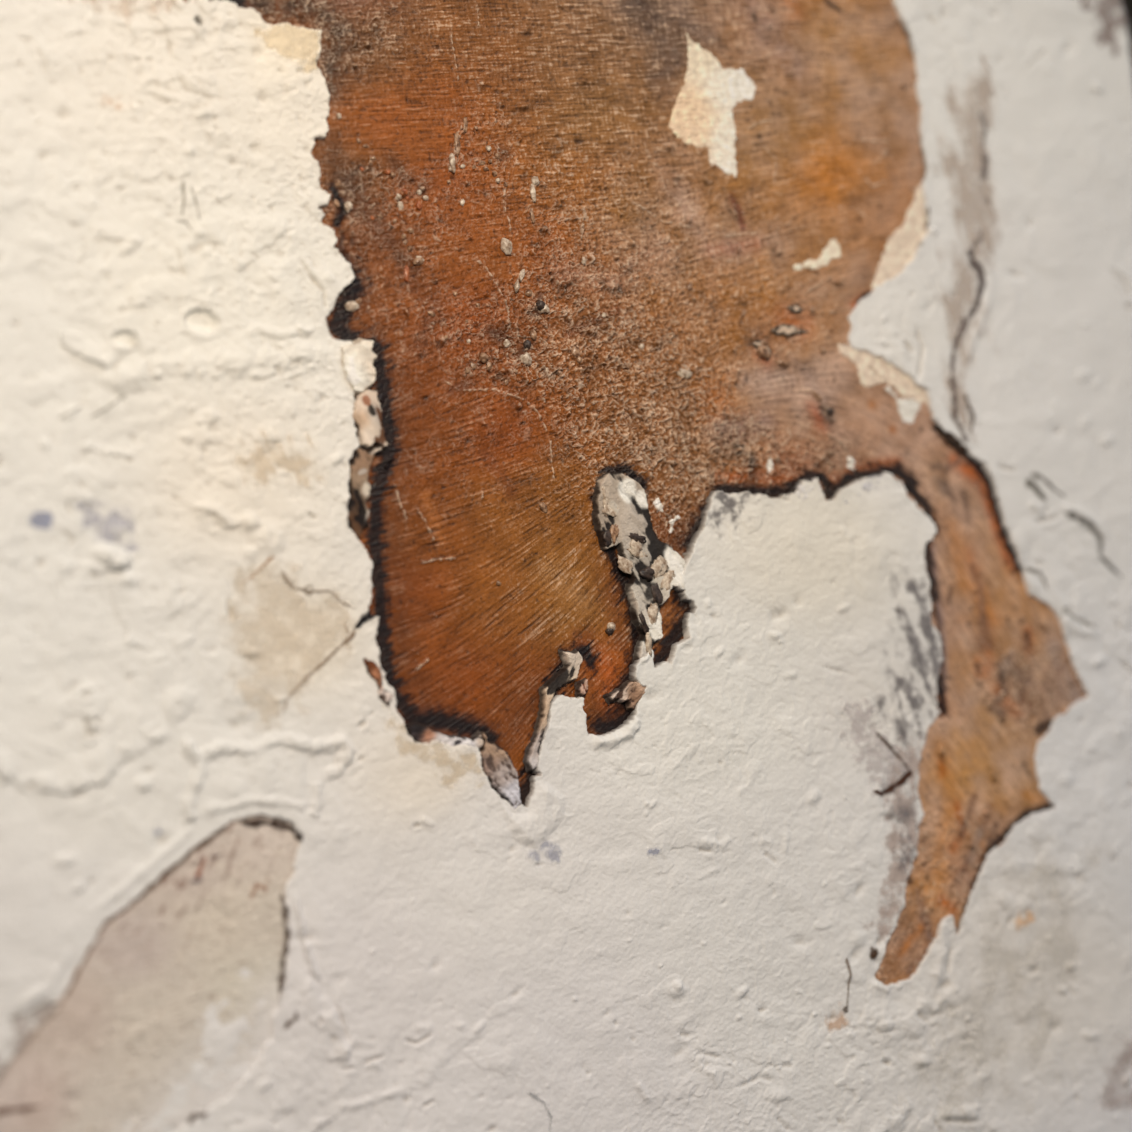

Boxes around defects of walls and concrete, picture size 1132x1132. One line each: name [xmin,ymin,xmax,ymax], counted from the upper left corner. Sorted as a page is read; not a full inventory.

crack [979,112,990,204]
spalling [209,0,1087,985]
crack [950,231,985,442]
peeling [0,815,303,1132]